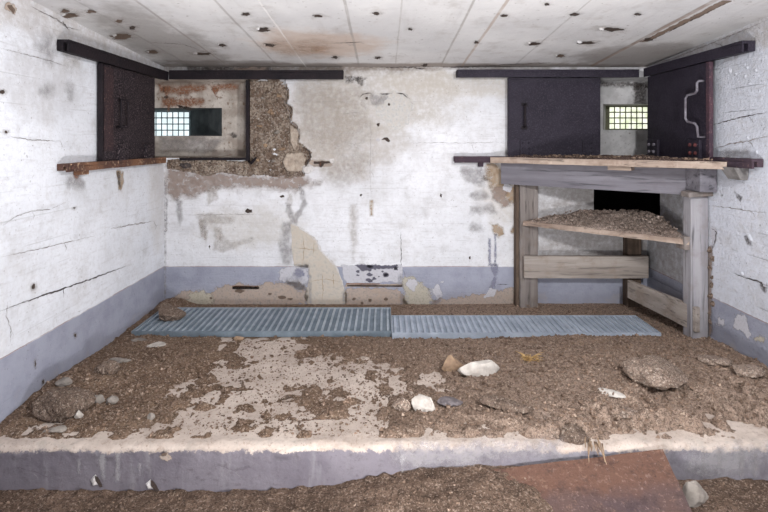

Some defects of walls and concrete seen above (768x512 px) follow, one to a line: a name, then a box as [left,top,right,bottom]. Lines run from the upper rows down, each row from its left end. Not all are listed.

rust [158,84,238,111]
spalling [167,79,330,179]
crack [714,113,767,149]
crack [3,236,92,257]
flaking render [175,224,514,305]
peeling [718,314,765,343]